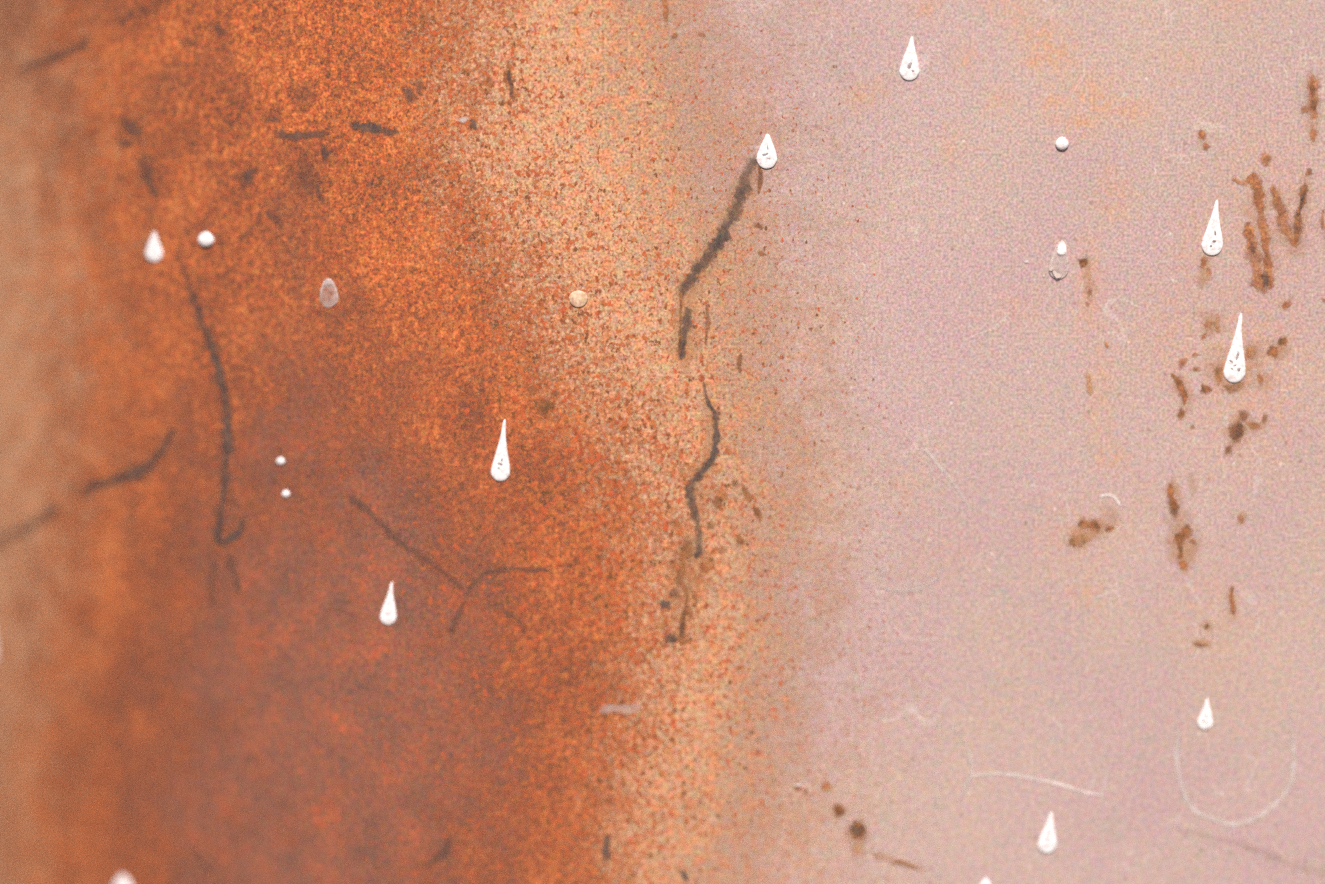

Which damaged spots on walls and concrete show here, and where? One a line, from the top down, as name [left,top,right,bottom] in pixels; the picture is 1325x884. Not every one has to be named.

rust [1302,78,1318,111]
crack [678,160,764,359]
rust [1232,154,1312,291]
rust [1171,317,1241,418]
rust [1246,338,1287,358]
crack [195,306,244,544]
rust [0,0,911,884]
rust [1225,412,1259,454]
crack [657,393,731,646]
rust [1070,520,1114,546]
rust [1168,484,1195,569]